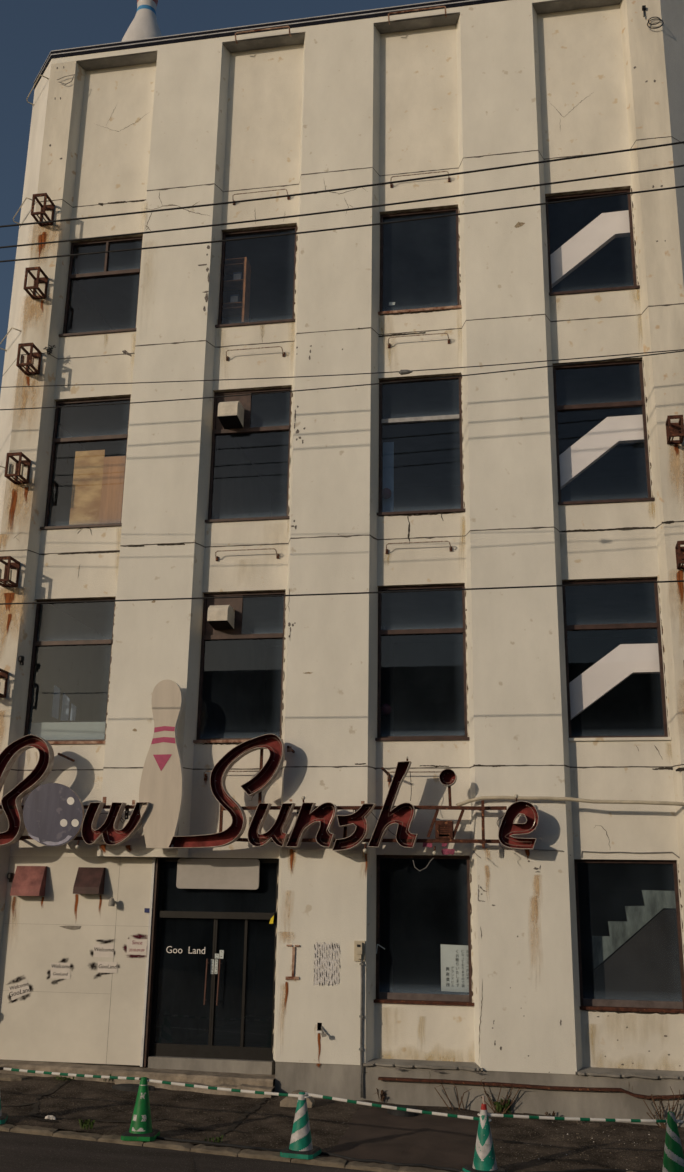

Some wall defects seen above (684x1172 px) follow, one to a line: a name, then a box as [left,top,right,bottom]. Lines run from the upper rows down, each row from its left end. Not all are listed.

rust [0,479,31,546]
rust [0,588,25,643]
rust [676,570,684,614]